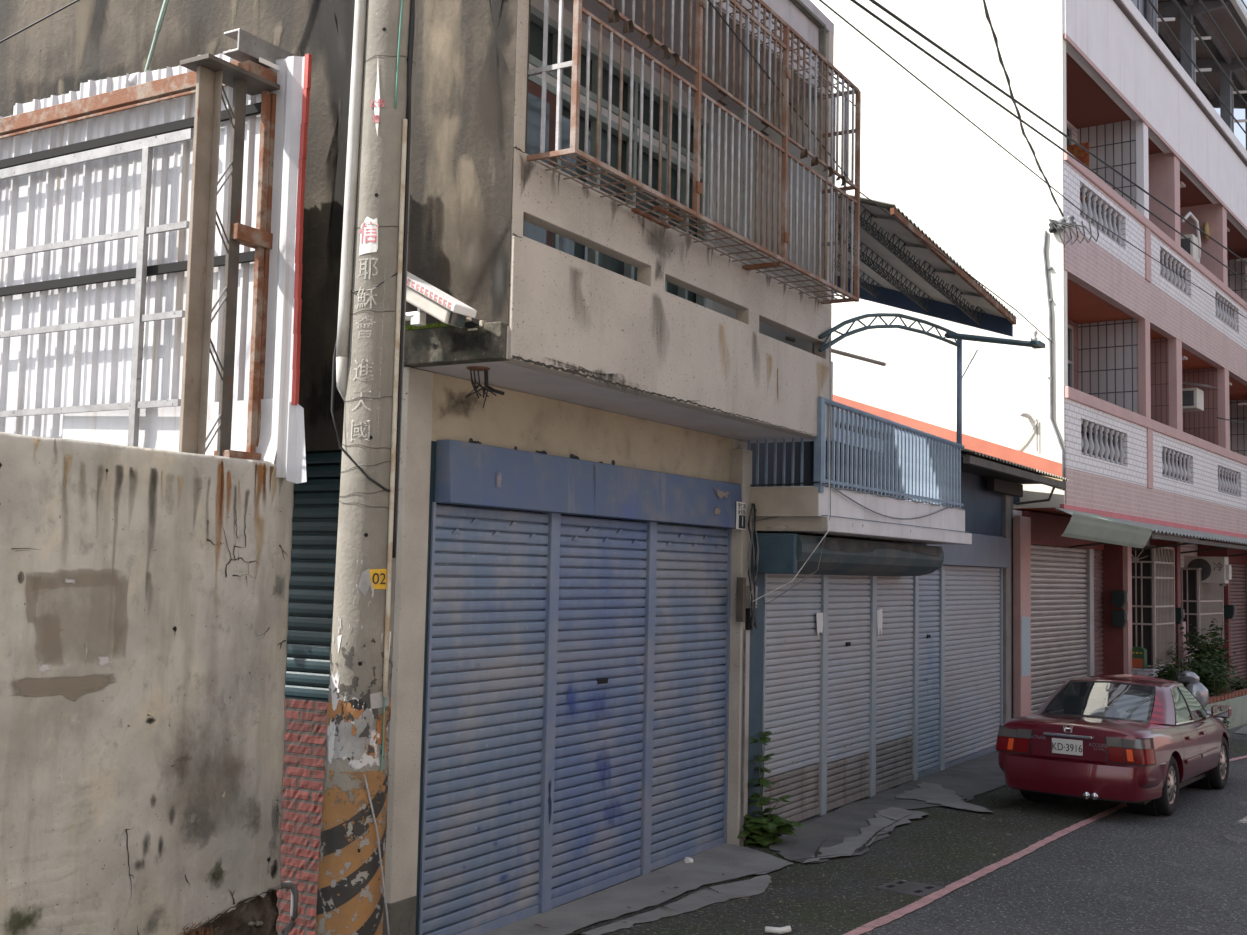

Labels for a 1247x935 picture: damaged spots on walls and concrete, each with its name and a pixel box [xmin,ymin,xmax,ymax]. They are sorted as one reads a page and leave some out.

leakage [79,0,90,48]
corrosion [217,461,231,533]
corrosion [255,463,283,503]
crack [207,504,288,580]
peeling [325,571,392,770]
leakage [212,865,223,883]
flaking render [187,889,274,935]